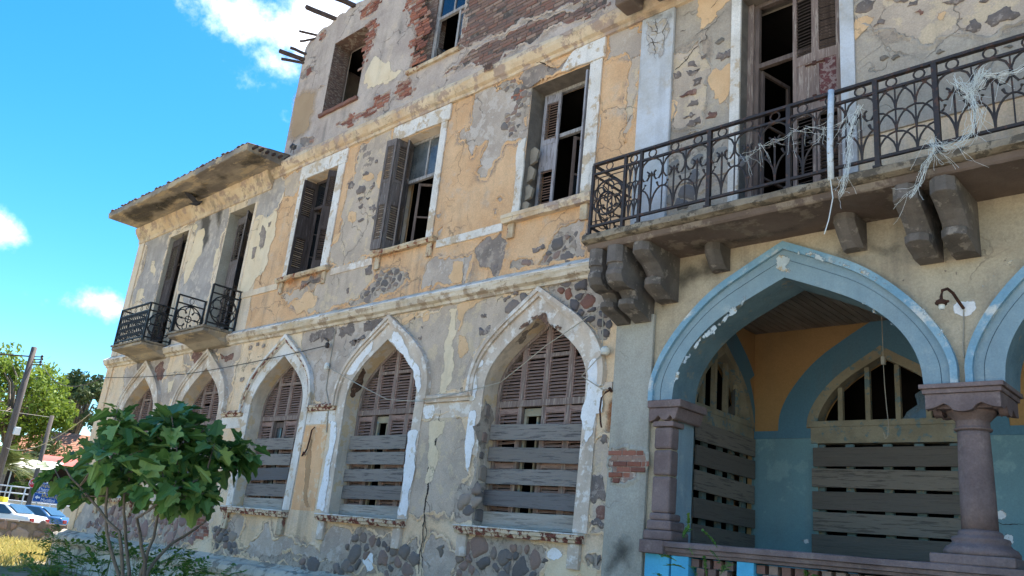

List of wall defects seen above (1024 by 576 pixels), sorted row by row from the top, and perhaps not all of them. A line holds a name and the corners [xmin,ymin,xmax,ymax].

flaking render [336,0,433,129]
peeling [456,56,568,181]
spalling [853,0,1024,54]
peeling [280,129,588,317]
peeling [776,251,885,284]
peeling [674,297,746,382]
peeling [71,279,616,576]
crack [418,410,441,576]
peeling [581,358,649,536]